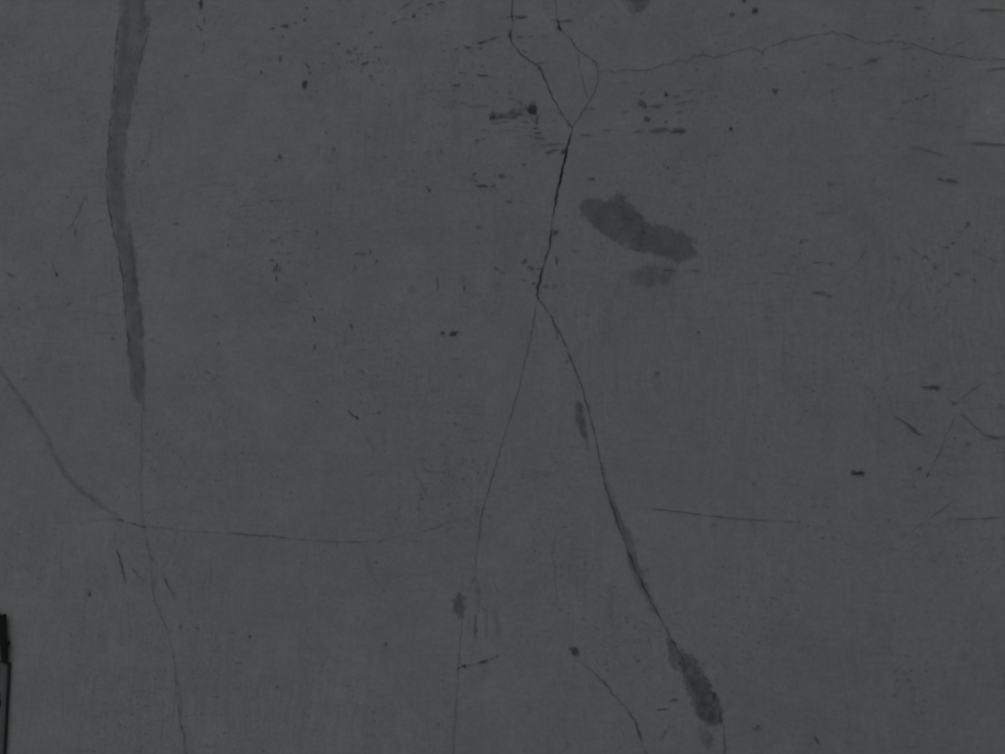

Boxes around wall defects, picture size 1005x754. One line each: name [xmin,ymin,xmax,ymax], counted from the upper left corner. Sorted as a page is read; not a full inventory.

crack [549,135,571,242]